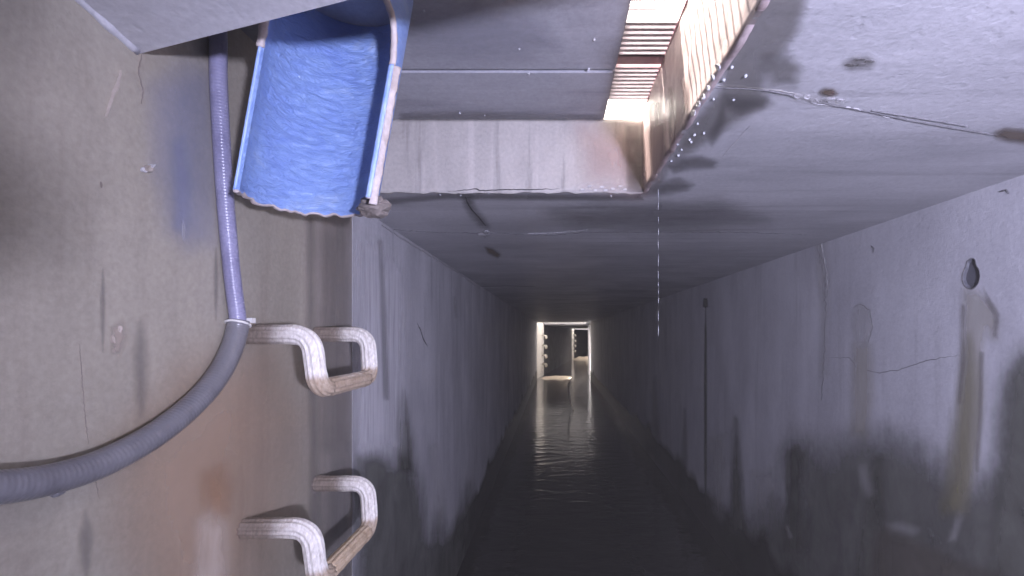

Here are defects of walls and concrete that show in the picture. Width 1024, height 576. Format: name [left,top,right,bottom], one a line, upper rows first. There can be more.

crack [449,186,554,194]
damp [645,0,801,186]
crack [715,85,997,136]
crack [670,231,957,400]
damp [590,297,1024,576]